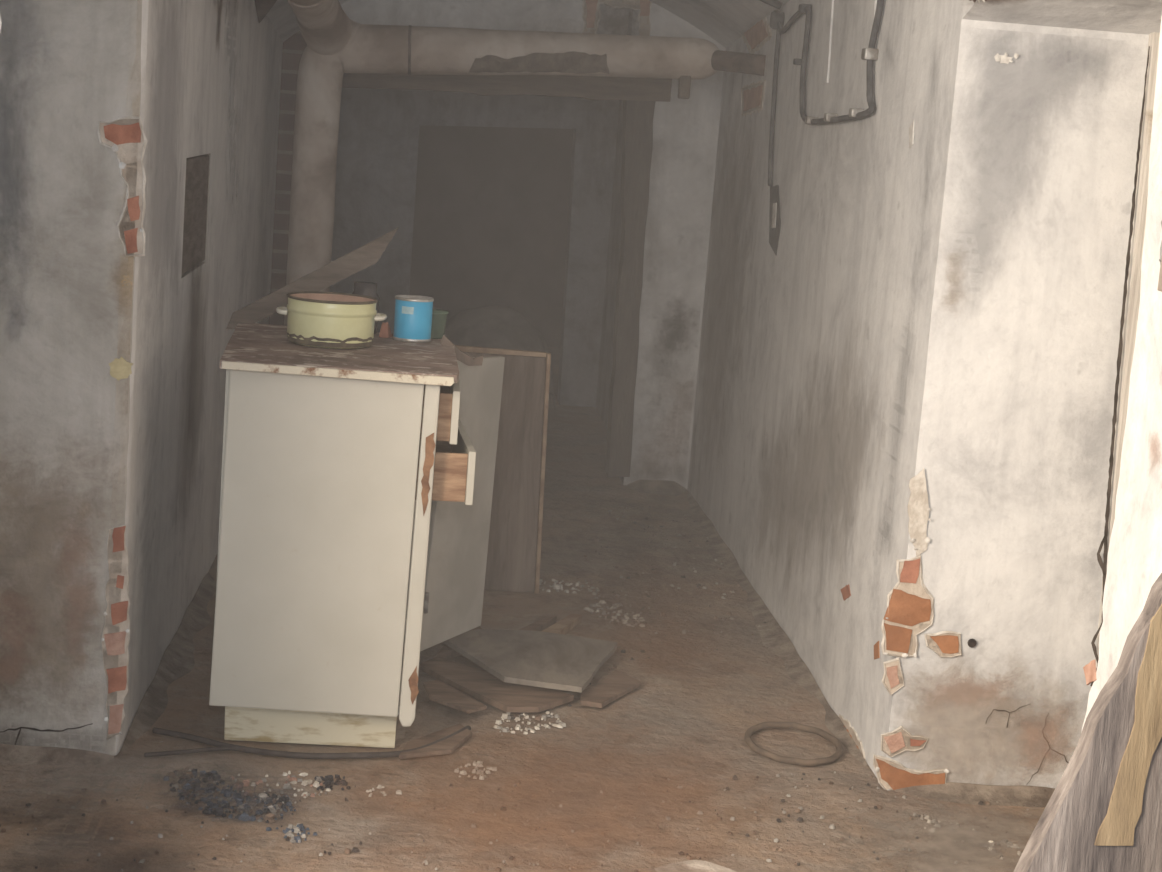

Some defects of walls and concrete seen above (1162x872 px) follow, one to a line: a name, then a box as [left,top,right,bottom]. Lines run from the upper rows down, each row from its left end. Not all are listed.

spalling [98,116,147,257]
crack [1090,46,1150,686]
spalling [101,524,130,740]
spalling [874,555,977,695]
spalling [838,714,949,791]
crack [985,704,1069,785]